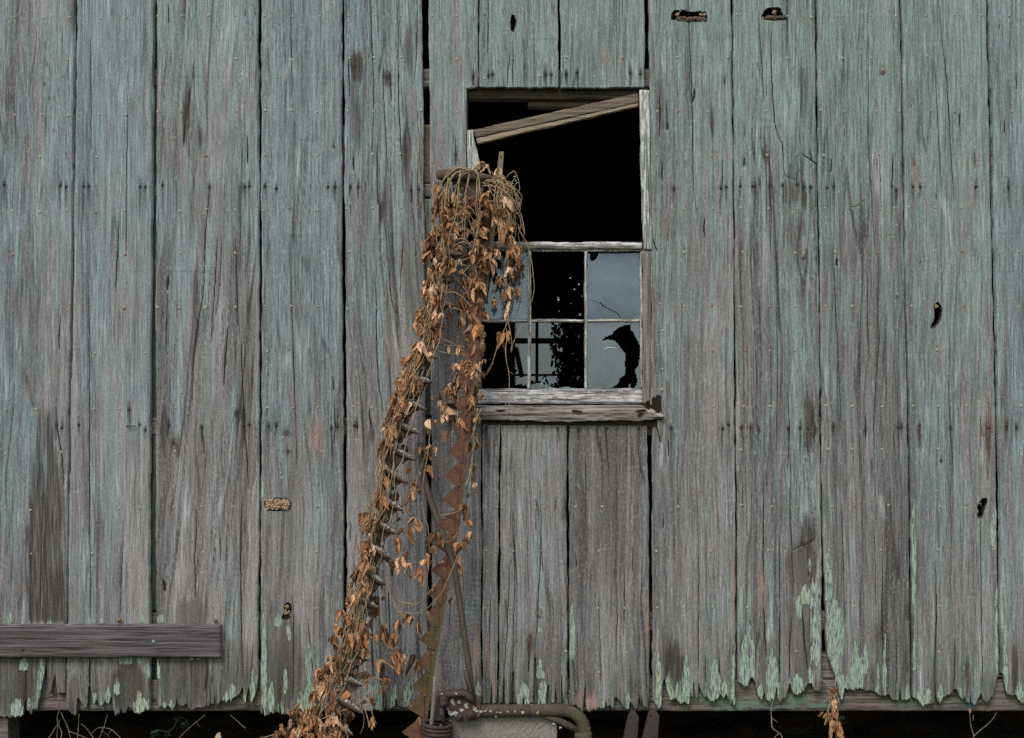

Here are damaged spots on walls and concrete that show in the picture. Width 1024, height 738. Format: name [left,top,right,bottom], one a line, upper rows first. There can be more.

crack [722,26,832,678]
peeling [795,558,811,619]
peeling [825,550,864,690]
peeling [27,657,45,708]
peeling [92,677,120,705]
peeling [133,691,149,714]
peeling [145,658,160,679]
peeling [223,668,284,713]
peeling [297,643,316,711]
peeling [656,651,691,708]
peeling [766,647,813,701]
peeling [1002,641,1024,702]